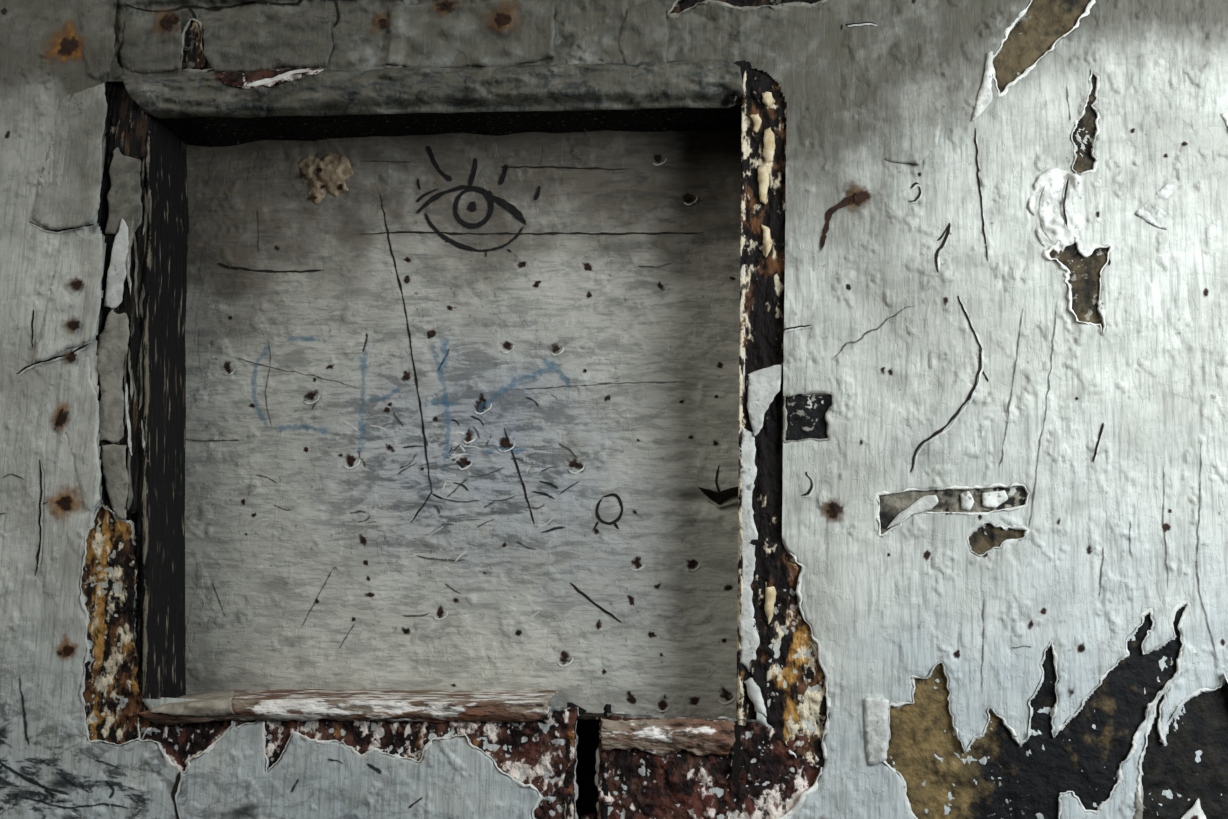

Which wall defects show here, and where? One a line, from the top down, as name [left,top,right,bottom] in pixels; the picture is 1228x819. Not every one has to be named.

corrosion [48,22,83,62]
peeling [972,0,1096,121]
corrosion [820,185,870,250]
peeling [1029,70,1114,336]
corrosion [49,489,80,517]
peeling [718,365,833,717]
peeling [875,483,1030,556]
corrosion [57,504,579,819]
corrosion [595,539,831,819]
peeling [864,600,1228,819]